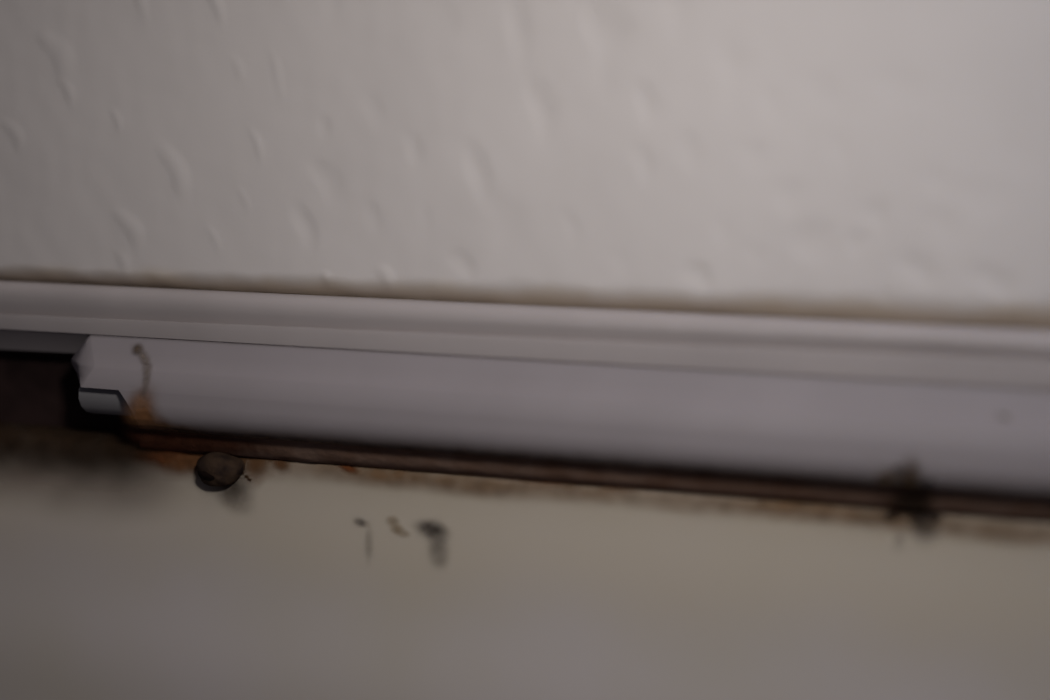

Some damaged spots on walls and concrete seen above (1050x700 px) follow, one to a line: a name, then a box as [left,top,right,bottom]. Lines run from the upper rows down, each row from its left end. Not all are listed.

water stain [424,524,440,534]